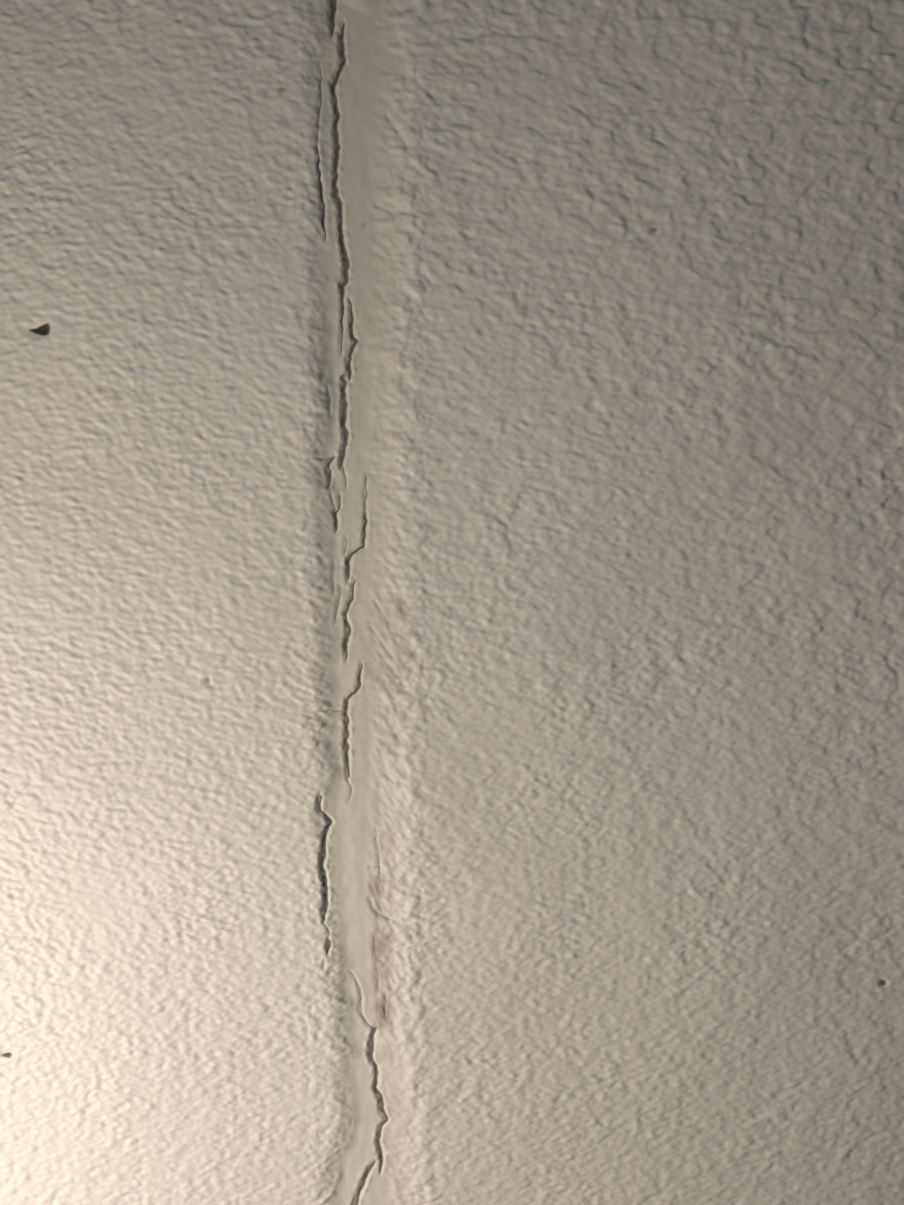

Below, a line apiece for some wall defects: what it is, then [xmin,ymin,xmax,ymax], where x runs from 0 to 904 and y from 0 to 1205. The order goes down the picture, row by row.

crack [317,0,367,777]
crack [318,796,332,953]
crack [354,1027,388,1205]